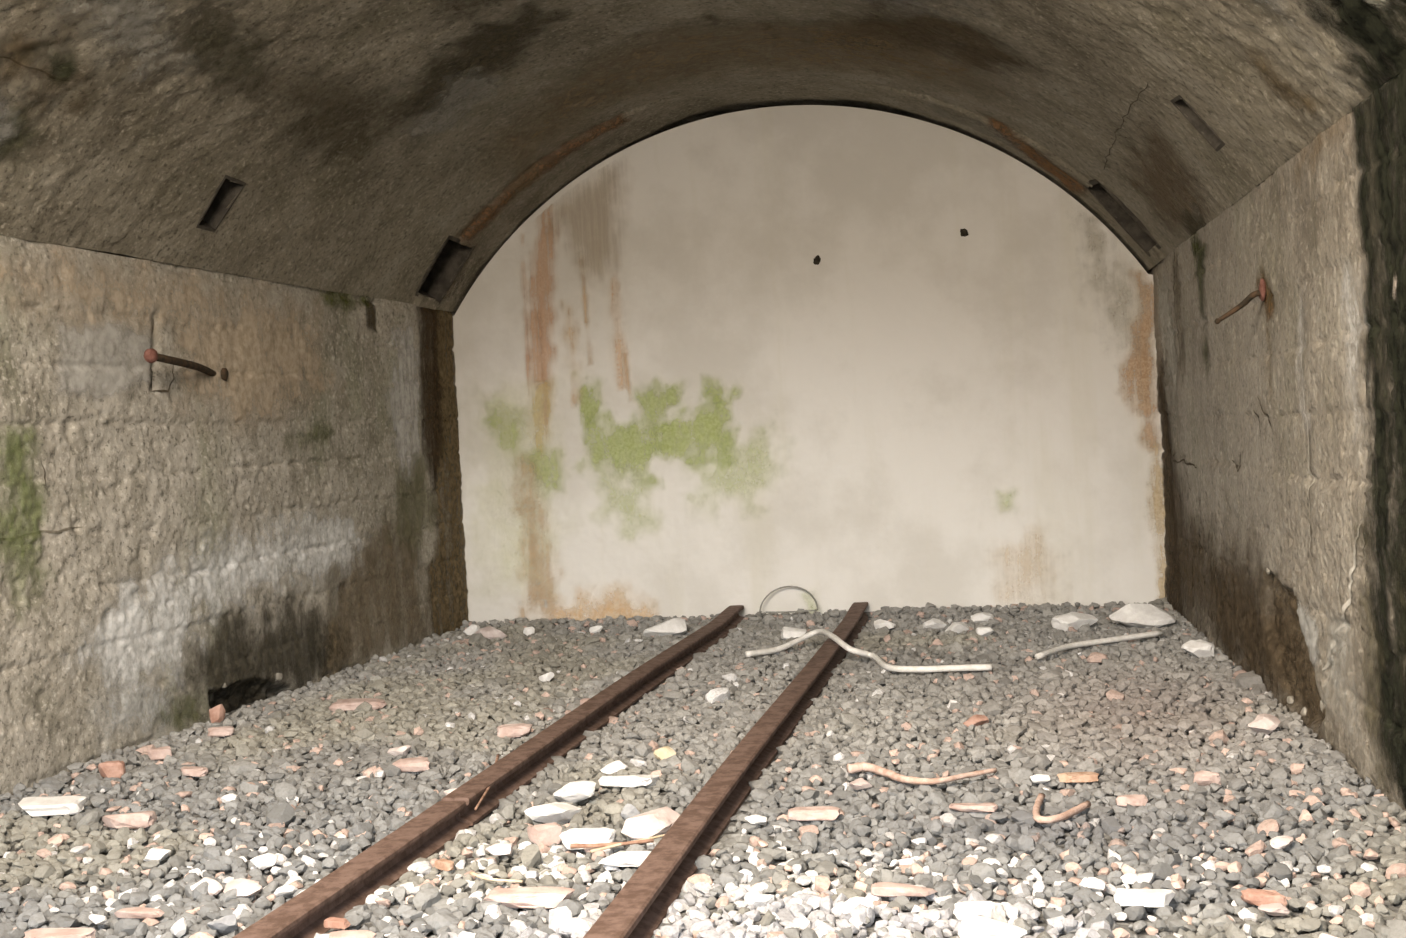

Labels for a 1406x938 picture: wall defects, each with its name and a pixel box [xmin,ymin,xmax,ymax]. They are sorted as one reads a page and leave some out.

water stain [94,0,272,90]
water stain [399,4,565,136]
corrosion [33,250,331,421]
water stain [365,300,376,332]
corrosion [528,225,553,444]
corrosion [1257,273,1274,321]
corrosion [1123,275,1167,598]
crack [0,527,82,540]
water stain [79,307,468,728]
spalling [1264,568,1326,725]